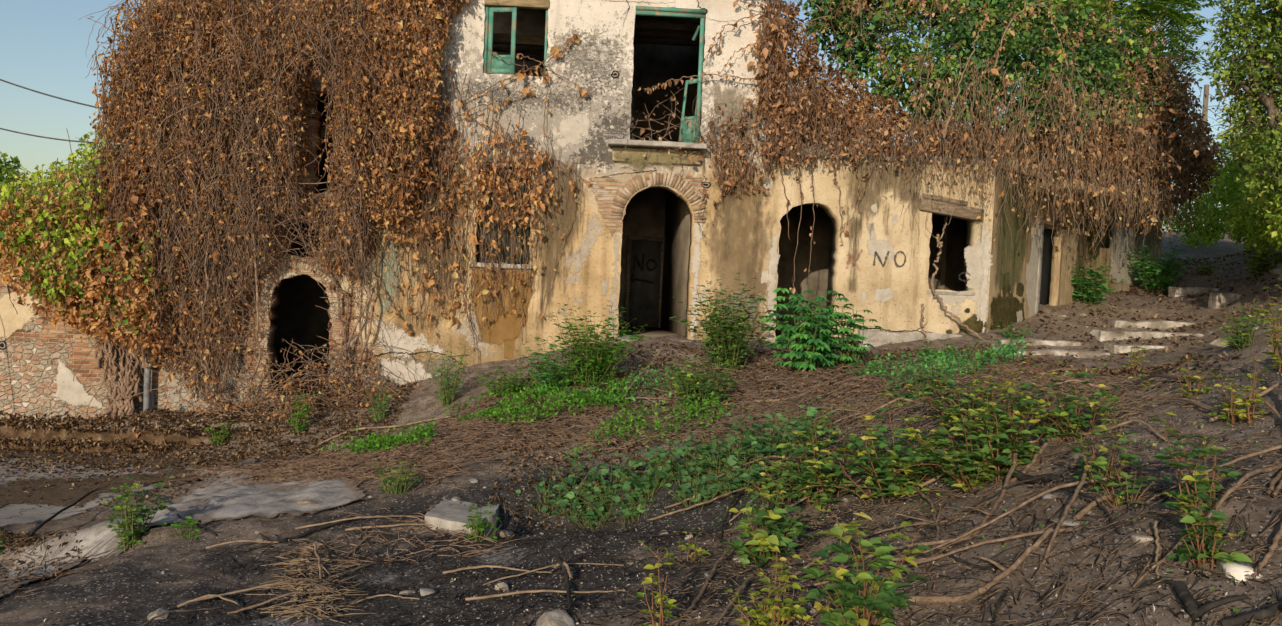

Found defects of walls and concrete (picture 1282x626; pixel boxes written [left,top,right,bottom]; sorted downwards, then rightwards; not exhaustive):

water stain [481,87,701,316]
water stain [996,177,1030,295]
peeling [0,268,45,340]
peeling [150,249,459,412]
peeling [453,312,495,357]